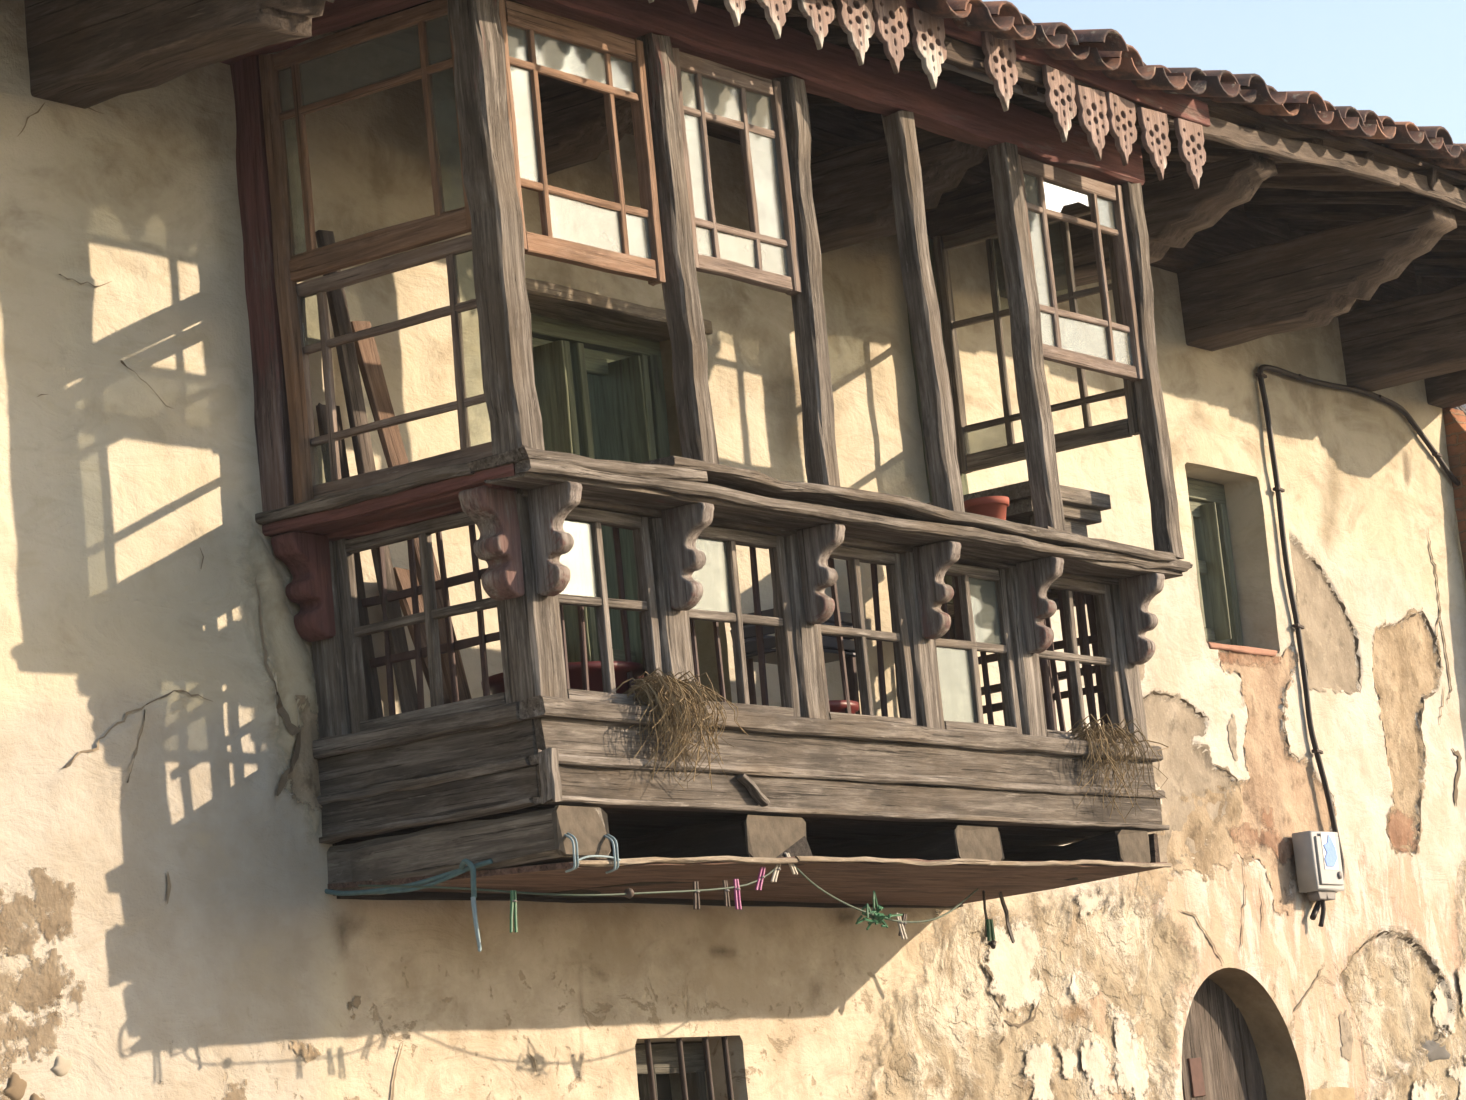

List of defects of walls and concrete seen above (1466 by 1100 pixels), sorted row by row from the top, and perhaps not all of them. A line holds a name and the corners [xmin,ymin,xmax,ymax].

crack [59,274,112,287]
crack [121,360,174,409]
crack [255,574,277,692]
crack [63,690,211,783]
spalling [1135,535,1444,916]
peeling [0,867,87,1100]
peeling [216,1079,261,1100]
peeling [979,916,1046,1018]
peeling [1067,968,1082,1003]
peeling [1021,1003,1151,1100]
spalling [1339,926,1466,1100]